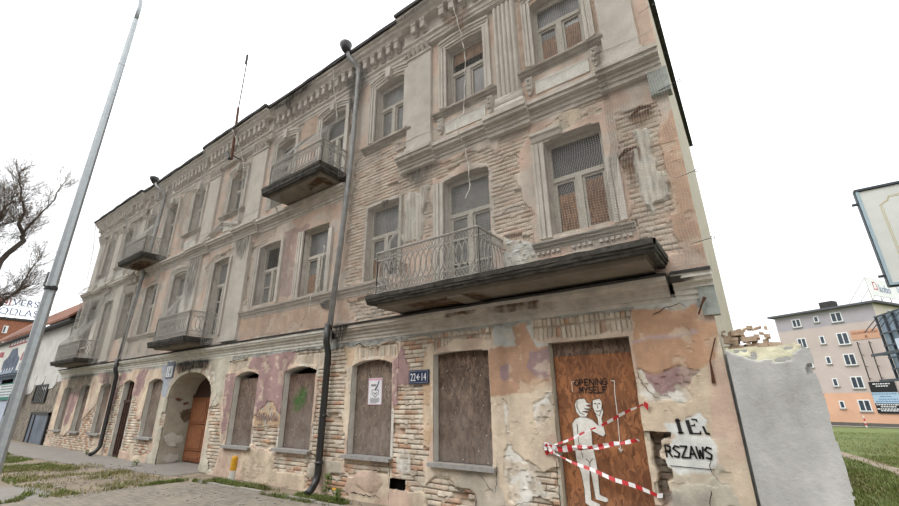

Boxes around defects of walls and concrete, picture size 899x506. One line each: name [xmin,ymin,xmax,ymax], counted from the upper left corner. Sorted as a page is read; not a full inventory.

spalling [345,127,536,286]
spalling [615,103,682,254]
spalling [47,385,149,457]
spalling [252,348,475,506]
spalling [357,326,492,370]
peeling [503,399,563,506]
peeling [533,392,554,426]
peeling [637,365,699,404]
peeling [649,413,718,506]